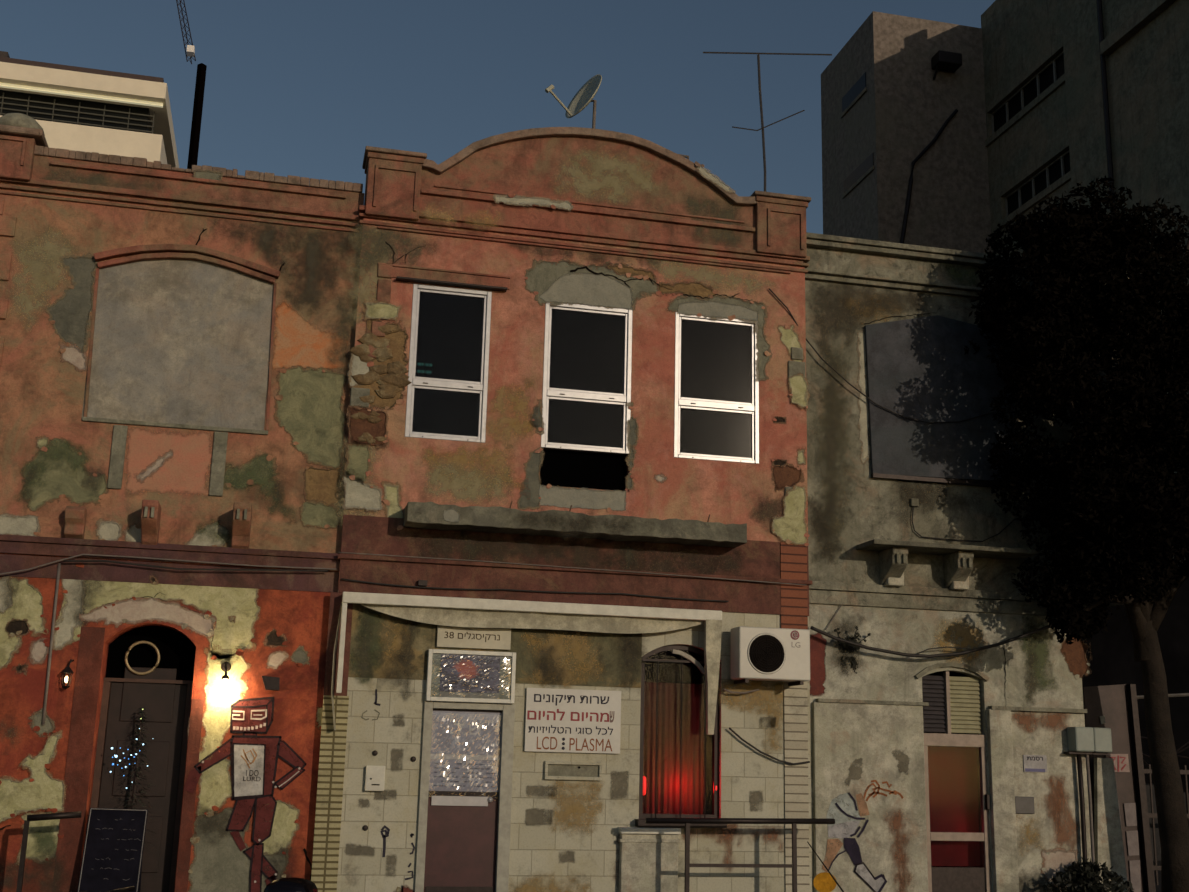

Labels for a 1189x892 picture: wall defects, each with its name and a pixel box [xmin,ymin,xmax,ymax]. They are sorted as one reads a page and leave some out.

flaking render [46,252,98,372]
flaking render [523,259,810,409]
flaking render [0,436,141,542]
peeling [126,425,277,496]
peeling [184,522,229,547]
flaking render [272,299,412,530]
flaking render [509,399,639,513]
flaking render [771,447,810,547]
flaking render [0,563,310,892]
rust [1047,776,1078,848]